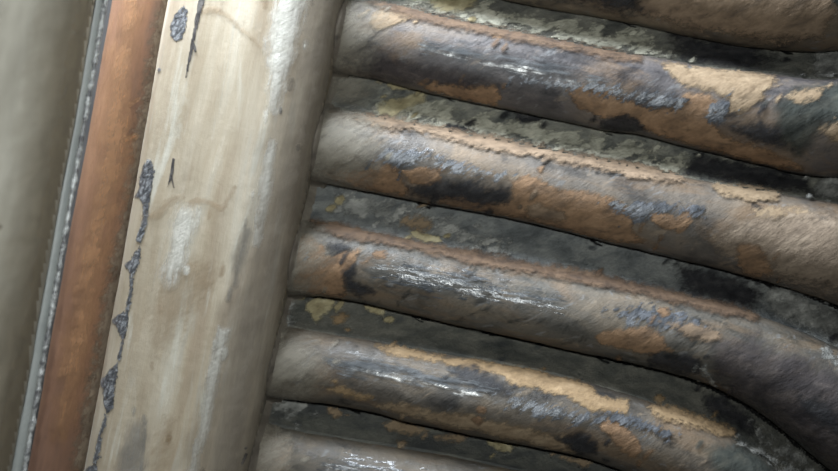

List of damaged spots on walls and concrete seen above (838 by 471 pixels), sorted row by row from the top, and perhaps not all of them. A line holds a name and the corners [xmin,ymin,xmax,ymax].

peeling [170,6,188,42]
crack [185,0,205,78]
rust [363,0,642,62]
rust [418,75,506,106]
rust [565,85,803,172]
peeling [85,159,155,471]
rust [375,402,575,453]
rust [596,418,653,466]